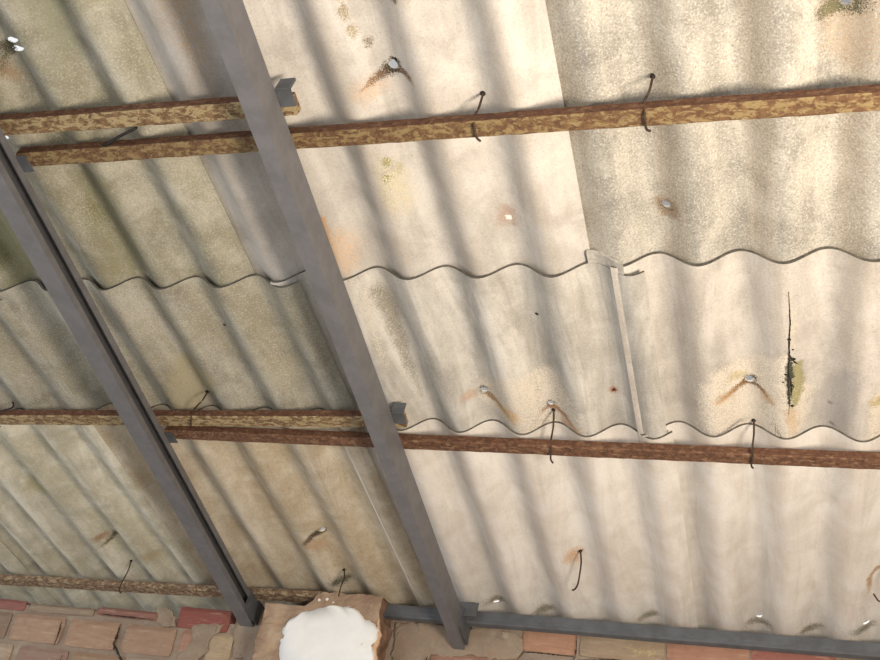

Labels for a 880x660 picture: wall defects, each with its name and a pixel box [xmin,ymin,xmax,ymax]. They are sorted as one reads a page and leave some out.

corrosion [345,56,414,110]
corrosion [459,365,588,436]
corrosion [692,349,815,438]
crack [782,292,808,438]
peeling [279,598,382,660]